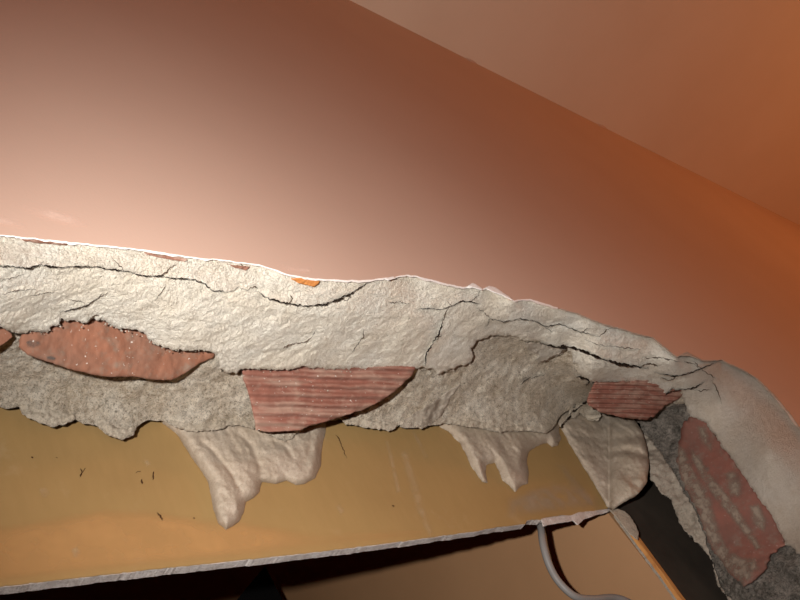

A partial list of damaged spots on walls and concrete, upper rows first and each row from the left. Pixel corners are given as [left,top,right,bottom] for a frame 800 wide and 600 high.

crack [0,258,370,321]
crack [388,291,722,403]
flaking render [0,235,800,600]